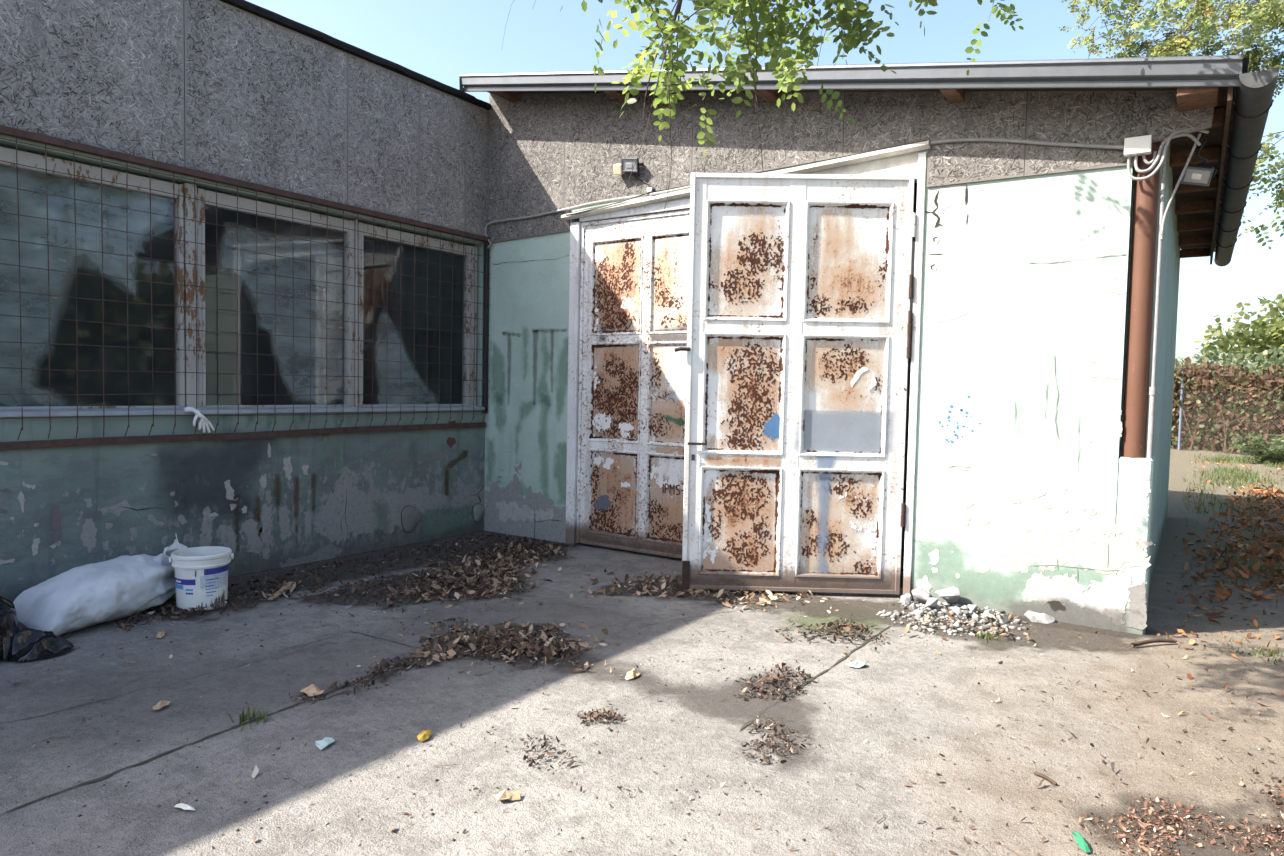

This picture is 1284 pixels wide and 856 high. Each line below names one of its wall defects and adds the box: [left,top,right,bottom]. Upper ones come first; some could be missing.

rust [708,202,785,318]
rust [807,204,890,319]
peeling [0,481,61,556]
peeling [267,443,309,481]
spalling [130,458,566,568]
damp [492,330,568,501]
rust [589,234,689,543]
rust [699,336,783,572]
rust [800,472,882,576]
rust [805,338,884,415]
spalling [916,549,953,594]
spalling [956,517,1155,630]